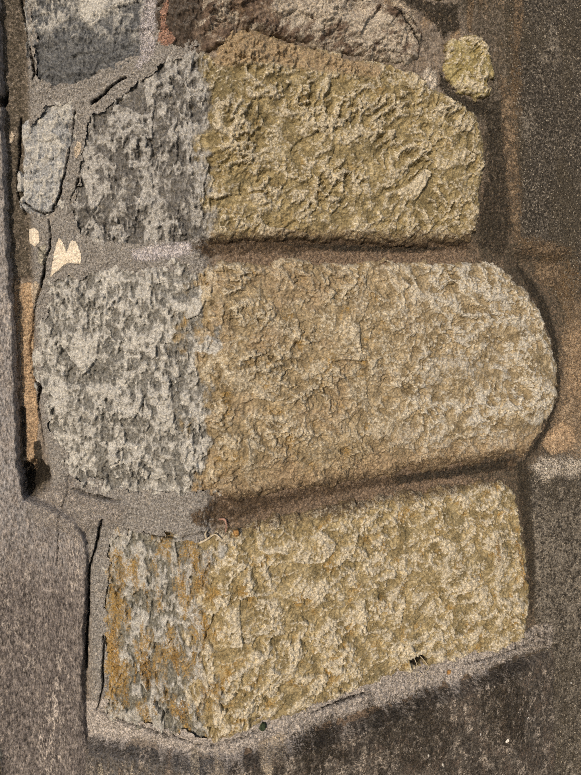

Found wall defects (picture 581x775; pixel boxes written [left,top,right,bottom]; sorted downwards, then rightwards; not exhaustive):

crack [394,7,420,51]
crack [17,77,127,308]
crack [84,521,219,746]
crack [311,692,364,713]